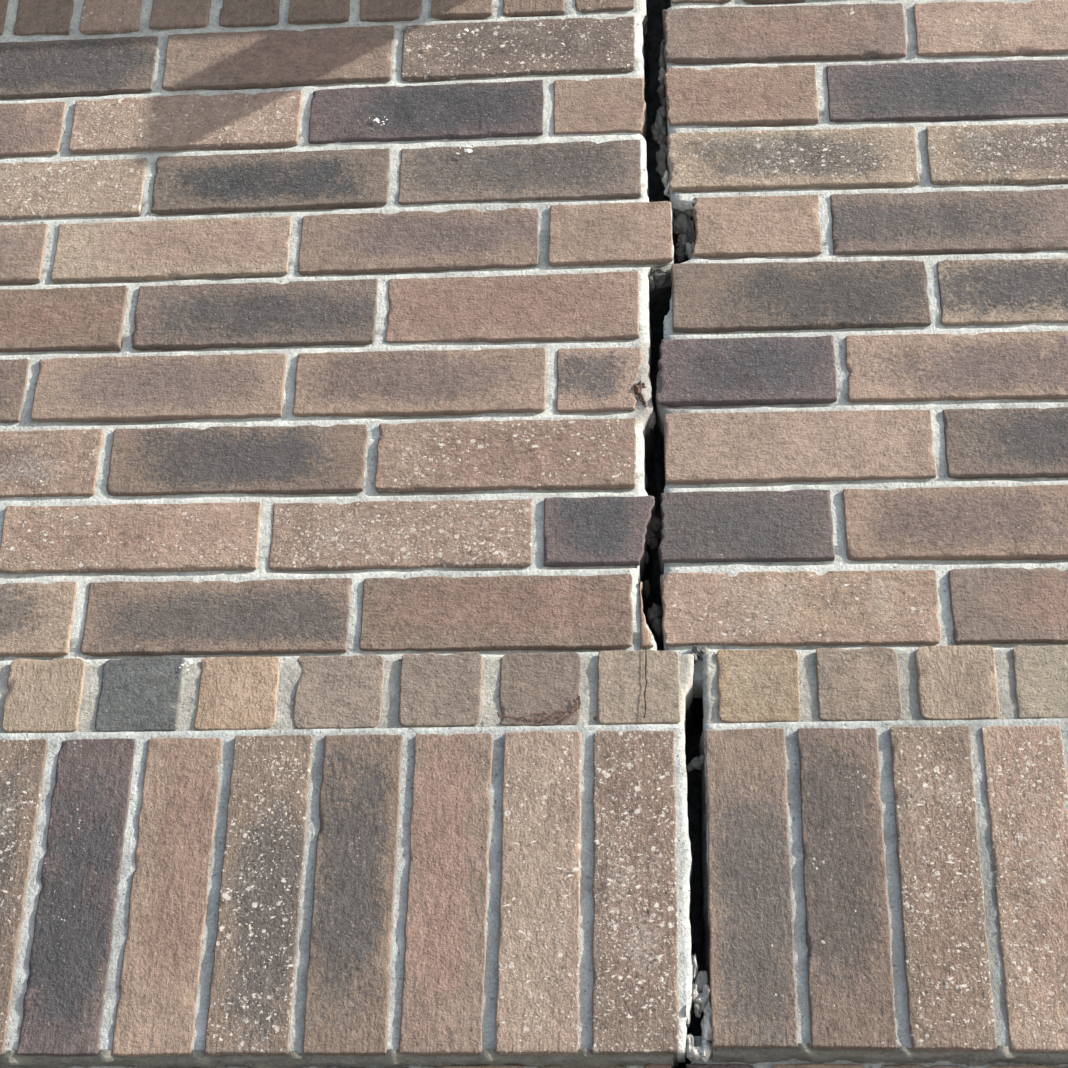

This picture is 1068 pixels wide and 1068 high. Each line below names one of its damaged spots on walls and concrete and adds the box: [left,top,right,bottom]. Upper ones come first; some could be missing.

crack [634,0,696,718]
crack [691,645,709,664]
crack [683,701,713,1068]